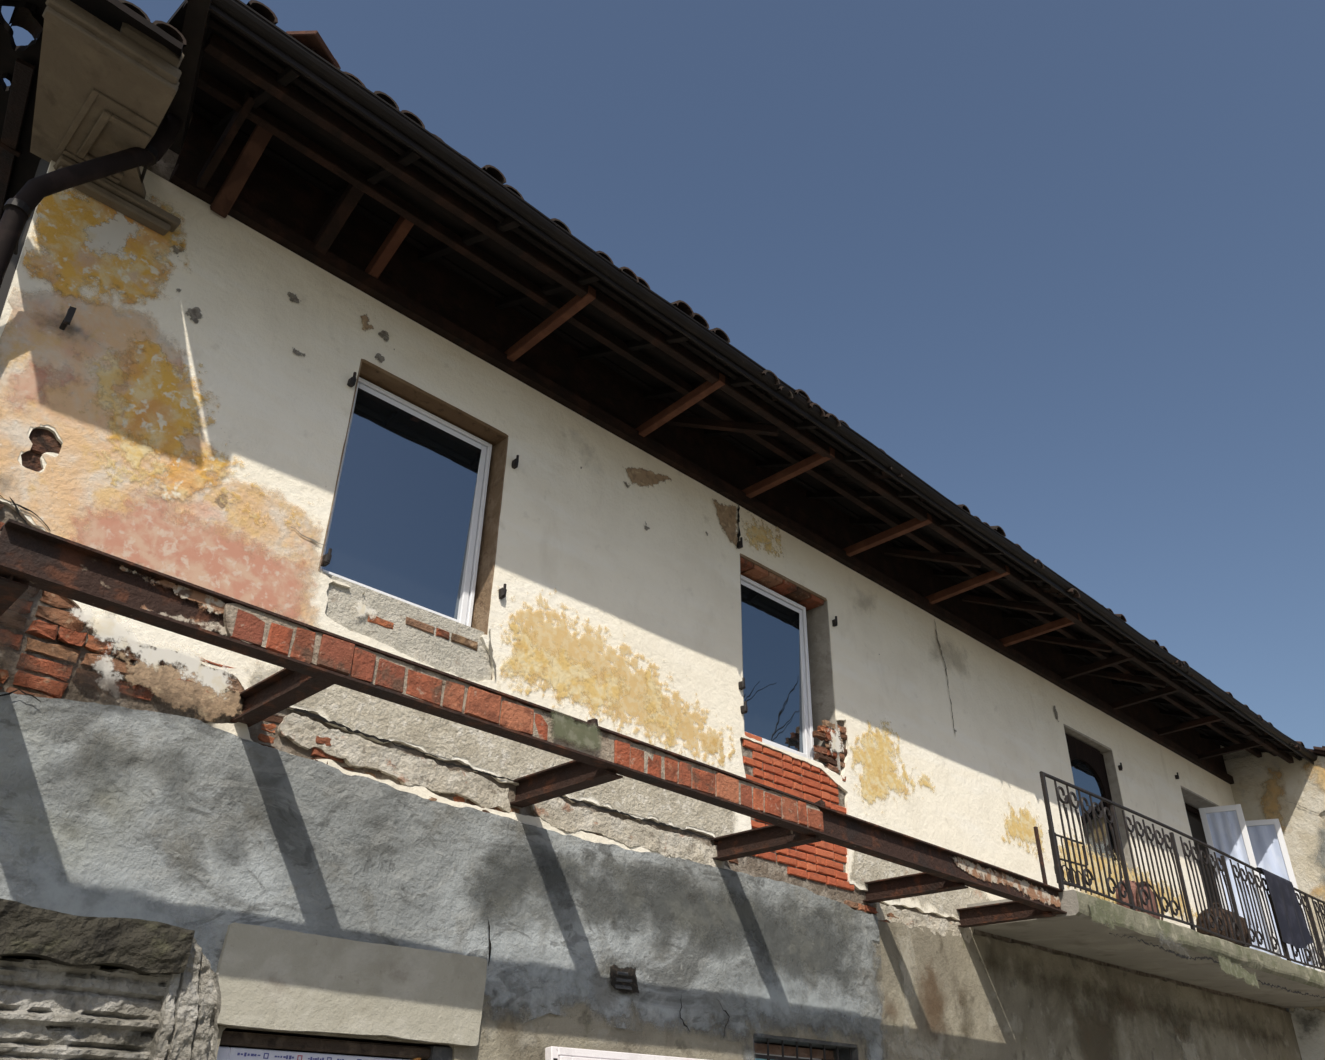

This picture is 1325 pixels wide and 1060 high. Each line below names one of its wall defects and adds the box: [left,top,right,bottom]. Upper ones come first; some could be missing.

spalling [0,0,47,218]
spalling [70,0,184,57]
peeling [0,191,735,766]
spalling [258,684,738,869]
peeling [812,720,934,804]
spalling [844,803,1198,943]